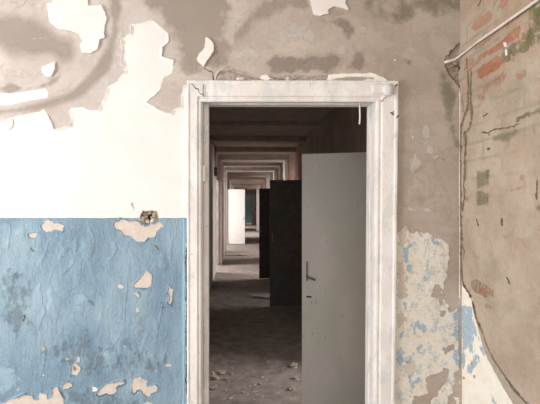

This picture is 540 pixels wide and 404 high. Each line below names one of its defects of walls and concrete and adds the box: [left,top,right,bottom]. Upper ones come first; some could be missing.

peeling [310,0,348,16]
damp [0,20,68,56]
damp [34,30,126,108]
peeling [0,0,214,132]
damp [147,0,249,70]
damp [270,45,347,72]
crack [460,58,517,282]
peeling [112,210,166,244]
peeling [131,269,154,299]
peeling [395,136,529,404]
peeling [0,355,82,404]
peeling [90,376,159,404]